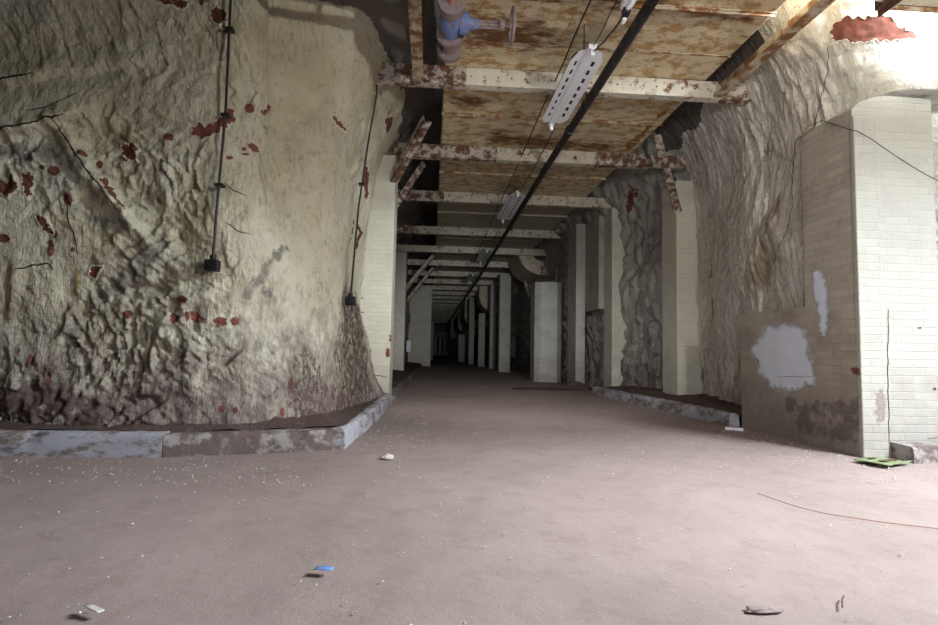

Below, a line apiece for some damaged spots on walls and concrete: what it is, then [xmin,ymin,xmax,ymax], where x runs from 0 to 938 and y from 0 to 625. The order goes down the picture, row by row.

corrosion [468,10,557,51]
corrosion [656,0,751,21]
crack [0,72,31,80]
corrosion [452,95,490,108]
corrosion [489,110,667,152]
crack [0,93,119,212]
crack [66,201,78,254]
crack [14,262,53,270]
leakage [287,285,373,416]
leakage [786,398,859,443]